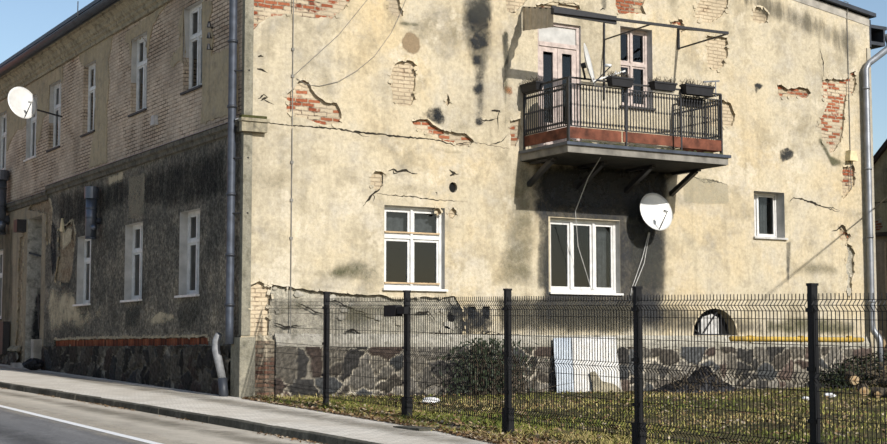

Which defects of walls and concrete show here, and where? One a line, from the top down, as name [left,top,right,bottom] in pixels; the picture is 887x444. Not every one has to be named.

flaking render [254,0,349,28]
damp [402,33,420,54]
damp [467,1,491,64]
flaking render [615,0,648,14]
flaking render [283,77,344,127]
crack [258,94,505,147]
flaking render [387,57,419,106]
flaking render [412,115,475,146]
flaking render [777,68,858,152]
crack [363,168,466,206]
crack [790,197,850,238]
flaking render [248,278,468,340]